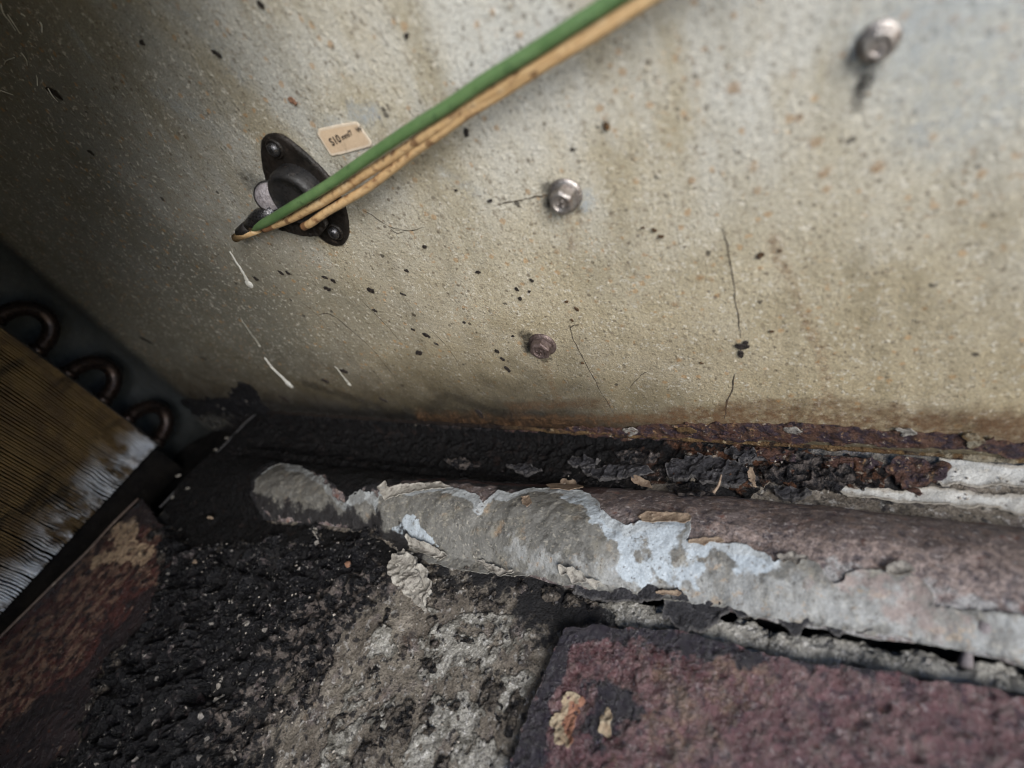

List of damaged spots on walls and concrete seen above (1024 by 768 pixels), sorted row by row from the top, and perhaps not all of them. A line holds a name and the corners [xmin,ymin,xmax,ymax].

crack [722,228,741,338]
crack [570,324,616,417]
crack [724,374,735,419]
corrosion [417,400,1024,460]
peeling [252,413,1024,674]
spalling [351,655,387,688]
spalling [323,713,348,738]
spalling [350,700,465,768]
spalling [477,679,526,738]